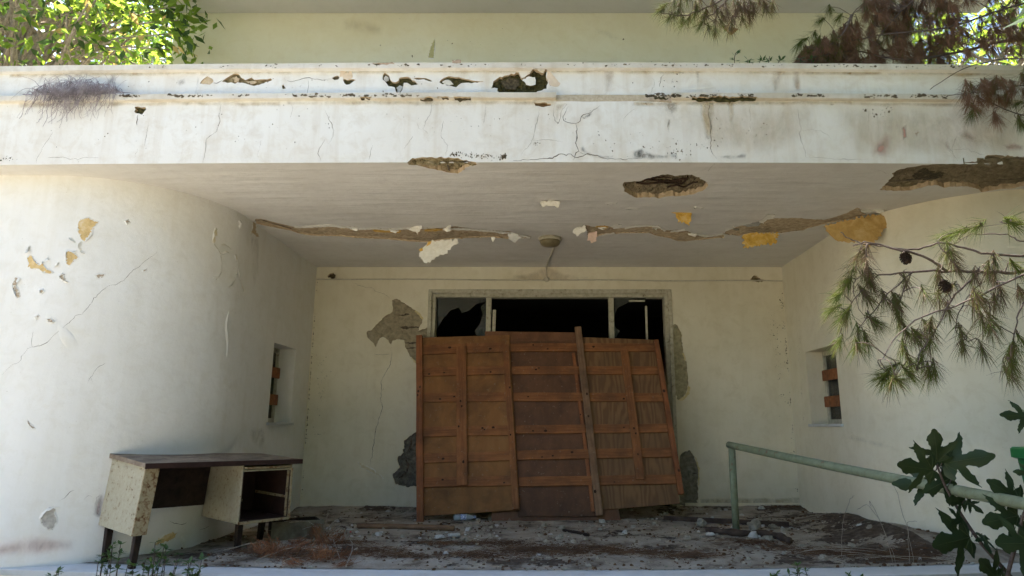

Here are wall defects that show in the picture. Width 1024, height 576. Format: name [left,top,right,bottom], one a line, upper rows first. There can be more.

spalling [200,75,285,89]
spalling [378,62,478,102]
spalling [493,71,560,107]
crack [513,104,647,161]
spalling [408,158,477,171]
spalling [625,174,706,194]
spalling [885,157,1024,188]
peeling [11,217,99,300]
flaking render [250,219,531,264]
peeling [572,208,892,248]
flaking render [367,299,427,363]
flaking render [393,432,416,487]